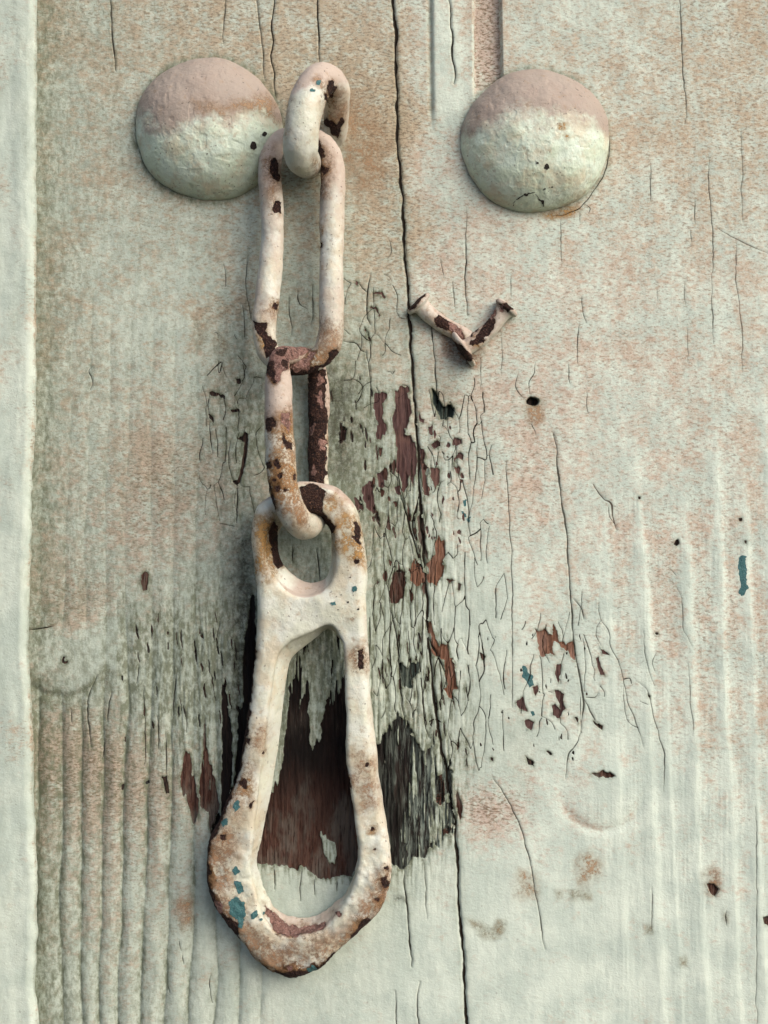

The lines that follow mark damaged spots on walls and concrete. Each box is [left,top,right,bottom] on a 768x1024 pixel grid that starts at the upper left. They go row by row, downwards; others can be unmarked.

corrosion [434,303,514,367]
peeling [207,391,243,413]
peeling [233,427,251,488]
peeling [334,377,465,604]
crack [342,0,665,1024]
peeling [136,613,241,833]
peeling [257,636,358,882]
peeling [378,617,468,744]
peeling [436,774,463,839]
peeling [508,624,586,732]
peeling [596,645,609,675]